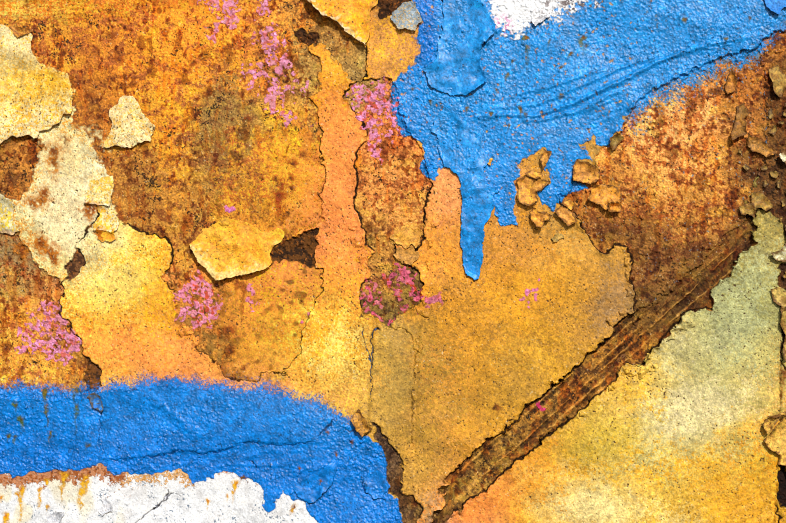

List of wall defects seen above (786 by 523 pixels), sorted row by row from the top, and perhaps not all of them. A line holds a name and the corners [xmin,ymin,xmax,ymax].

peeling [423,0,496,96]
peeling [531,15,551,26]
peeling [764,0,786,15]
spalling [0,0,434,412]
corrosion [272,176,294,216]
corrosion [14,236,59,265]
spalling [432,29,786,523]
crack [362,327,380,395]
spalling [351,409,422,523]
peeling [47,511,64,523]